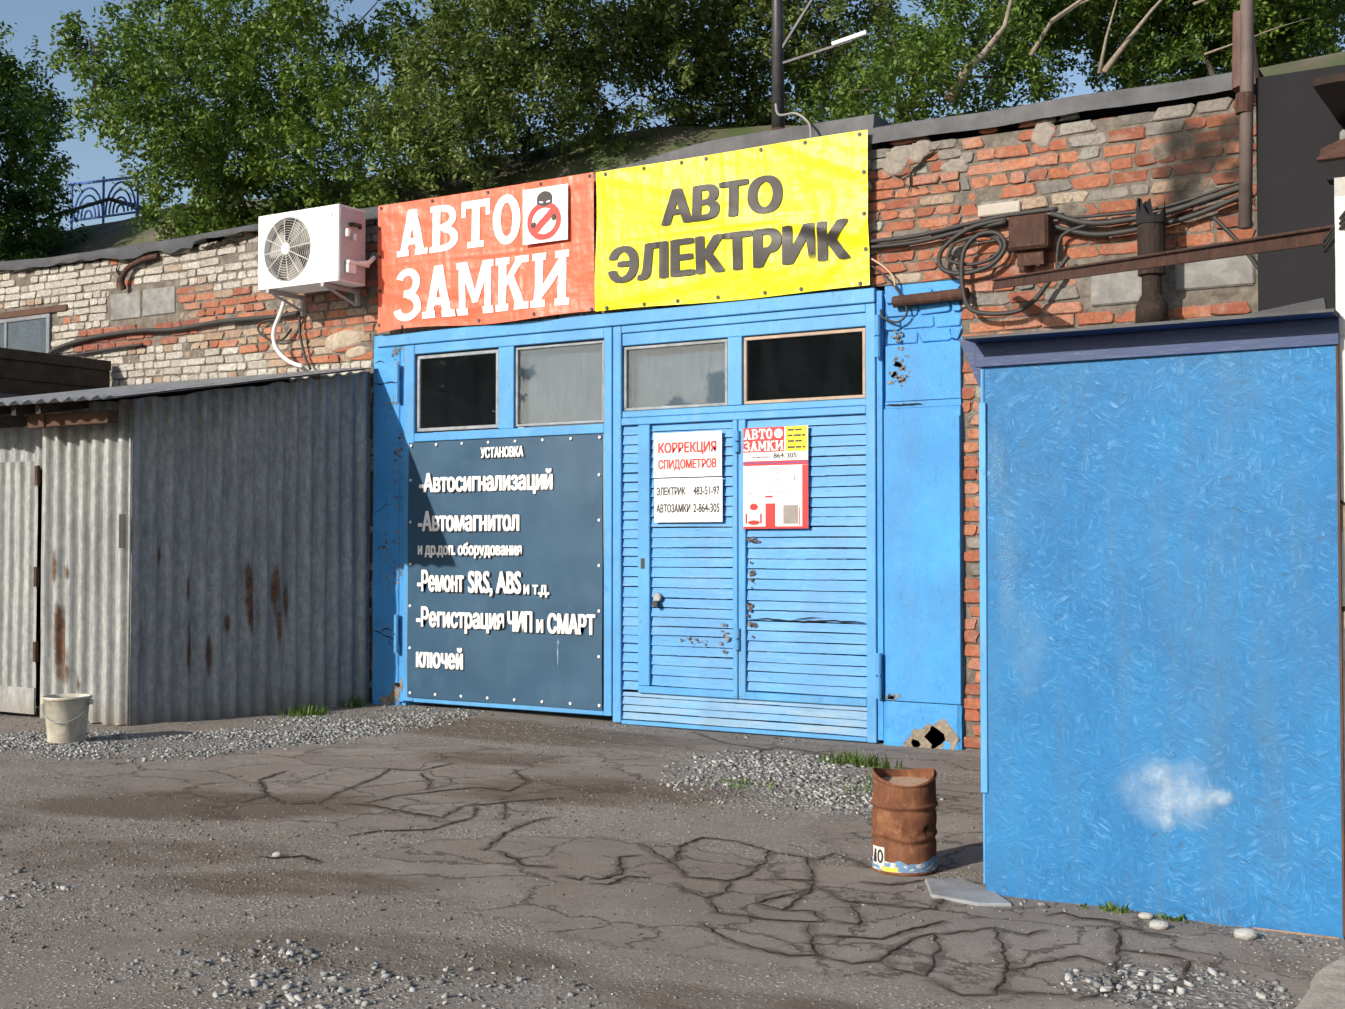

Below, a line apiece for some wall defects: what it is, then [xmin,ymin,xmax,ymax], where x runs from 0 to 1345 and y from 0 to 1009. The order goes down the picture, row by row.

peeling [887,329,911,386]
corrosion [245,563,253,631]
corrosion [271,569,288,640]
corrosion [53,605,78,690]